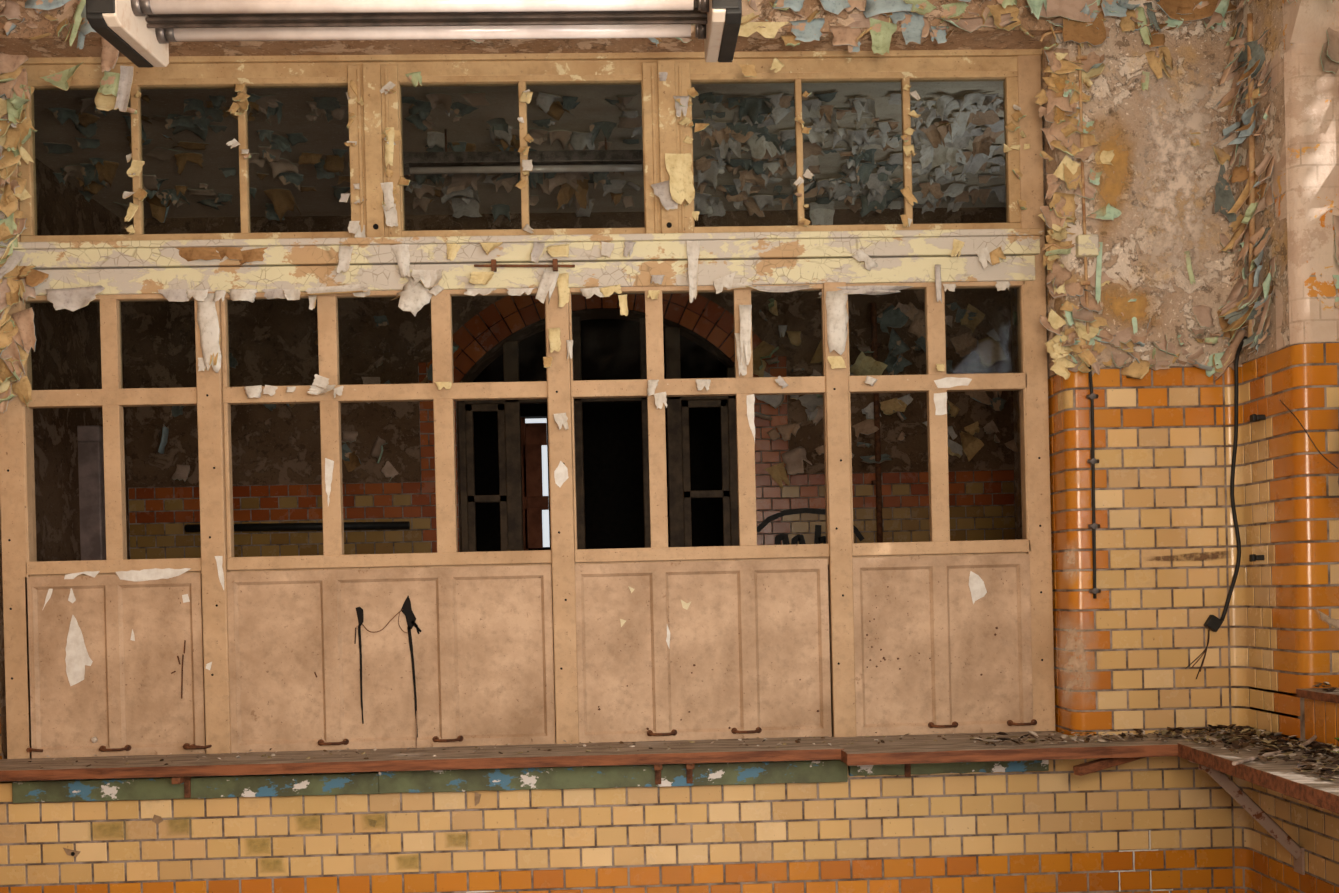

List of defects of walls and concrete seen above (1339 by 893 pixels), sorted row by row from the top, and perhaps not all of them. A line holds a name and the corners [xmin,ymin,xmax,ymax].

peeling [1320,28,1339,74]
peeling [0,0,1276,413]
peeling [714,239,1020,488]
peeling [158,406,185,454]
peeling [554,413,569,430]
peeling [172,464,190,481]
peeling [325,431,399,506]